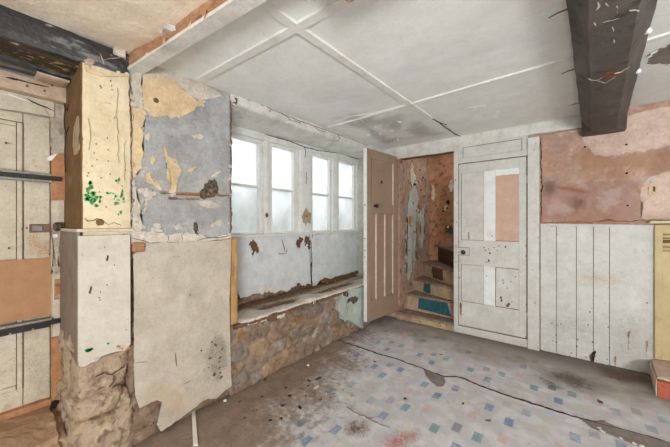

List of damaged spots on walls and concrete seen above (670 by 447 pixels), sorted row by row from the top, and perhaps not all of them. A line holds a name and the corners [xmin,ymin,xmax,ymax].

peeling [646,44,670,66]
peeling [84,46,239,246]
flaking render [583,107,670,157]
flaking render [637,171,670,220]
peeling [249,239,259,257]
peeling [296,236,311,251]
peeling [405,162,457,282]
flaking render [335,287,364,329]
crack [338,339,669,443]